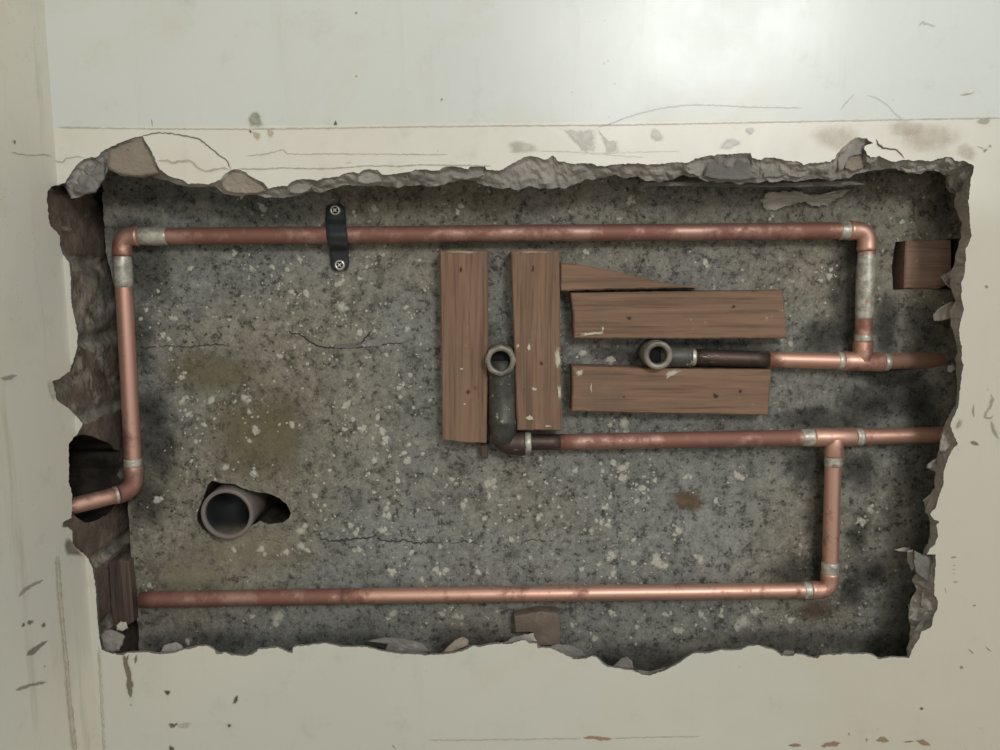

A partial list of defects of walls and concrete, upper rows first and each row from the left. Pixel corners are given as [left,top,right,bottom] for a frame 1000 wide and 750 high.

crack [143,132,230,172]
crack [285,329,403,349]
flaking render [56,136,974,675]